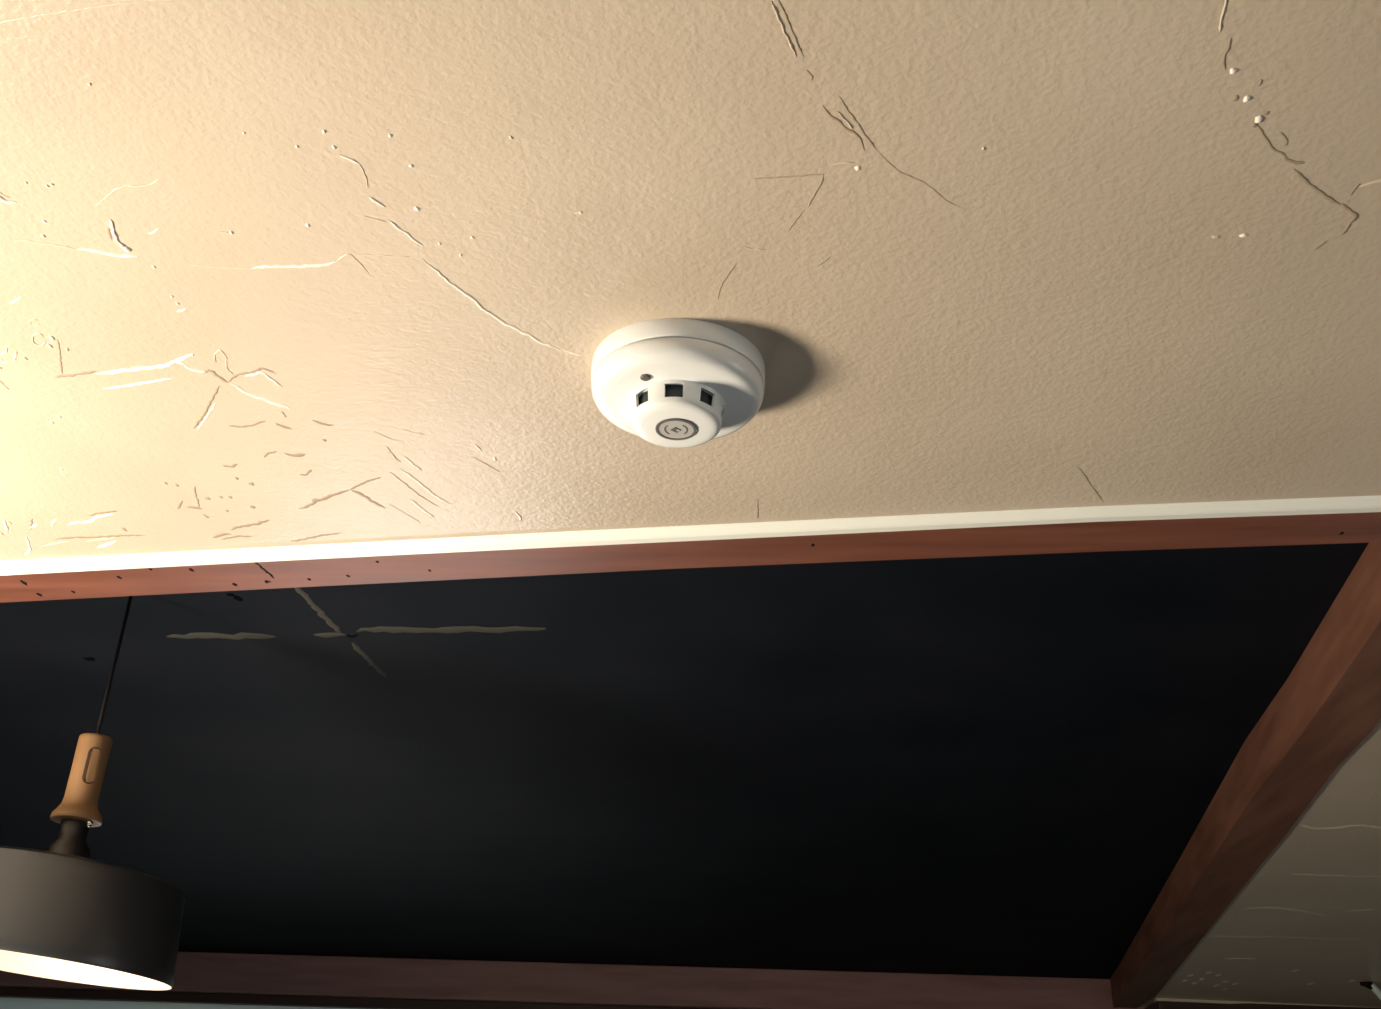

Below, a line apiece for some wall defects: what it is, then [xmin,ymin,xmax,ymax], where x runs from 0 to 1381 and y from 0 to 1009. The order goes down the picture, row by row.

crack [295,129,583,356]
crack [717,0,963,299]
crack [1211,232,1248,240]
crack [1219,0,1359,250]
crack [55,340,290,430]